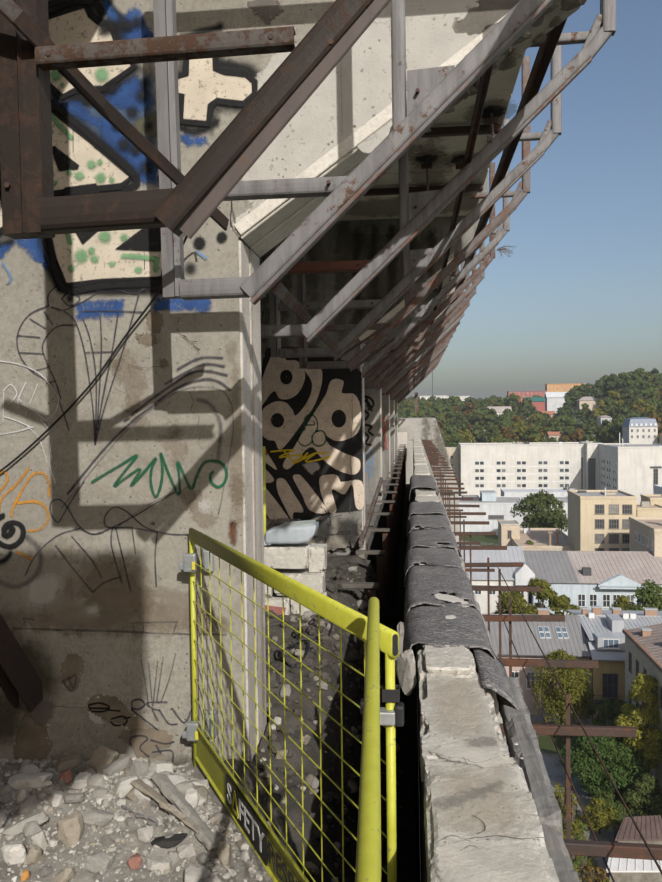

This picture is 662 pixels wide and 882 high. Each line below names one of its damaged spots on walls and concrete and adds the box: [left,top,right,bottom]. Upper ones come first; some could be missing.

spalling [493,0,587,71]
spalling [445,78,480,113]
peeling [60,653,84,691]
spalling [396,649,417,696]
peeling [85,694,173,759]
crack [436,815,544,850]